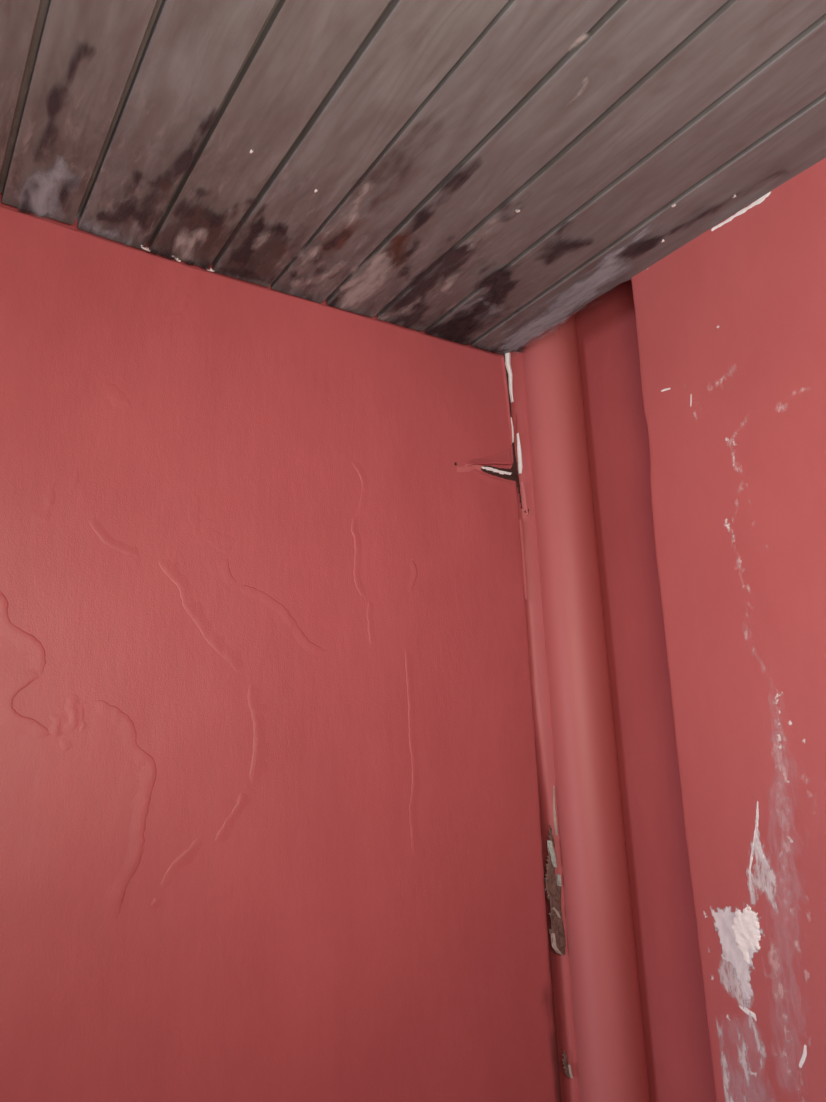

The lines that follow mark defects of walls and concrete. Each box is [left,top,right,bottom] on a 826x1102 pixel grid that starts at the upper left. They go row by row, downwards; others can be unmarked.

water stain [40,46,91,150]
water stain [20,161,78,216]
water stain [84,112,215,228]
water stain [145,190,287,280]
water stain [380,219,515,345]
water stain [485,205,720,353]
crack [501,352,529,600]
spalling [544,786,566,956]
peeling [703,801,777,1021]